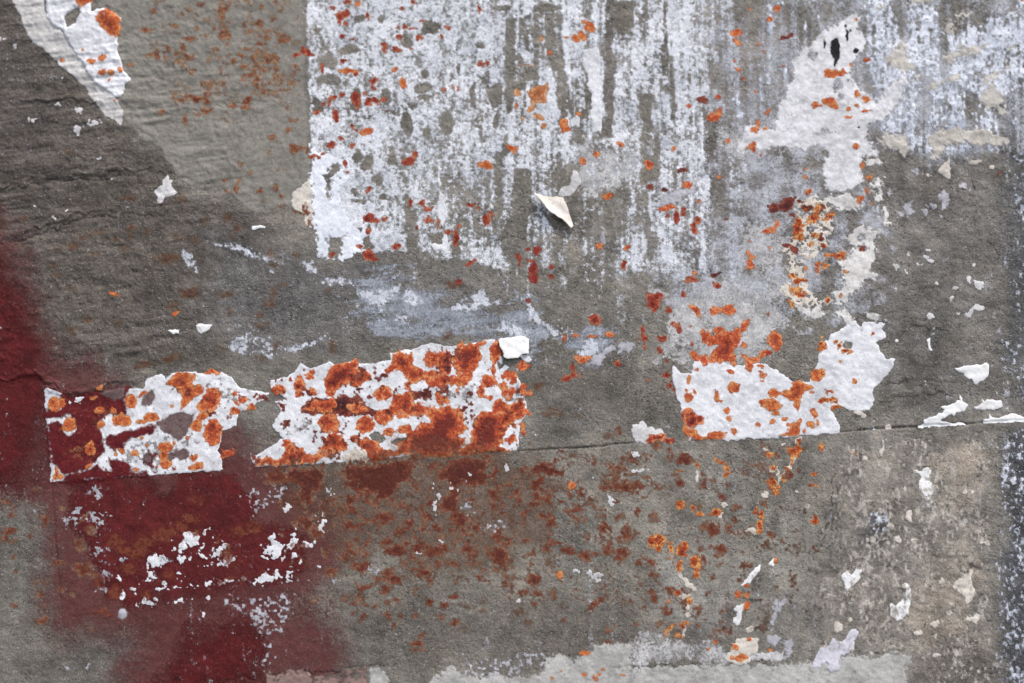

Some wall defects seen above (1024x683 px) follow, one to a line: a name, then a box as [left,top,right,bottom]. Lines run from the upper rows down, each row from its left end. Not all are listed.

corrosion [139,0,388,174]
peeling [97,0,819,372]
corrosion [646,184,702,234]
corrosion [686,95,722,122]
corrosion [745,168,865,308]
peeling [858,0,1024,221]
peeling [156,412,194,461]
corrosion [33,271,842,662]
crack [523,442,633,451]
peeling [429,329,1024,683]
crack [839,424,920,432]
peeling [90,512,390,683]